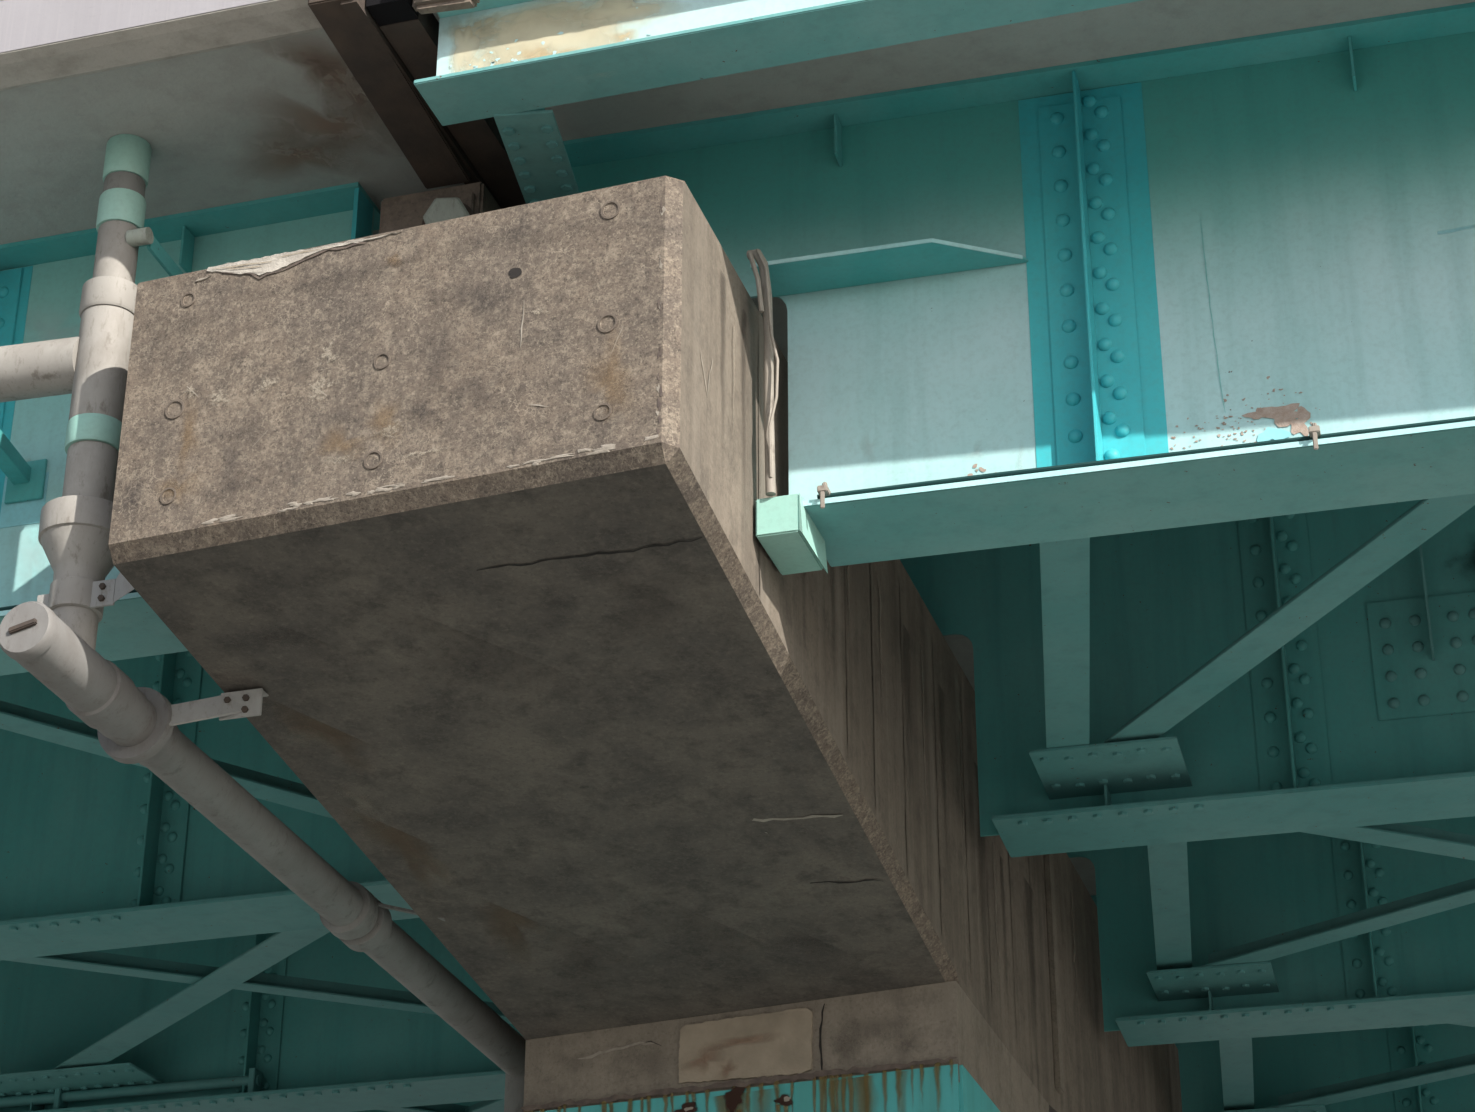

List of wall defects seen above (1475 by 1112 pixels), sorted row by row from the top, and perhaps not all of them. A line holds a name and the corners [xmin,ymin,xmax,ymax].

corrosion [455,0,653,70]
spalling [194,232,401,282]
crack [477,537,702,571]
corrosion [521,1057,957,1112]